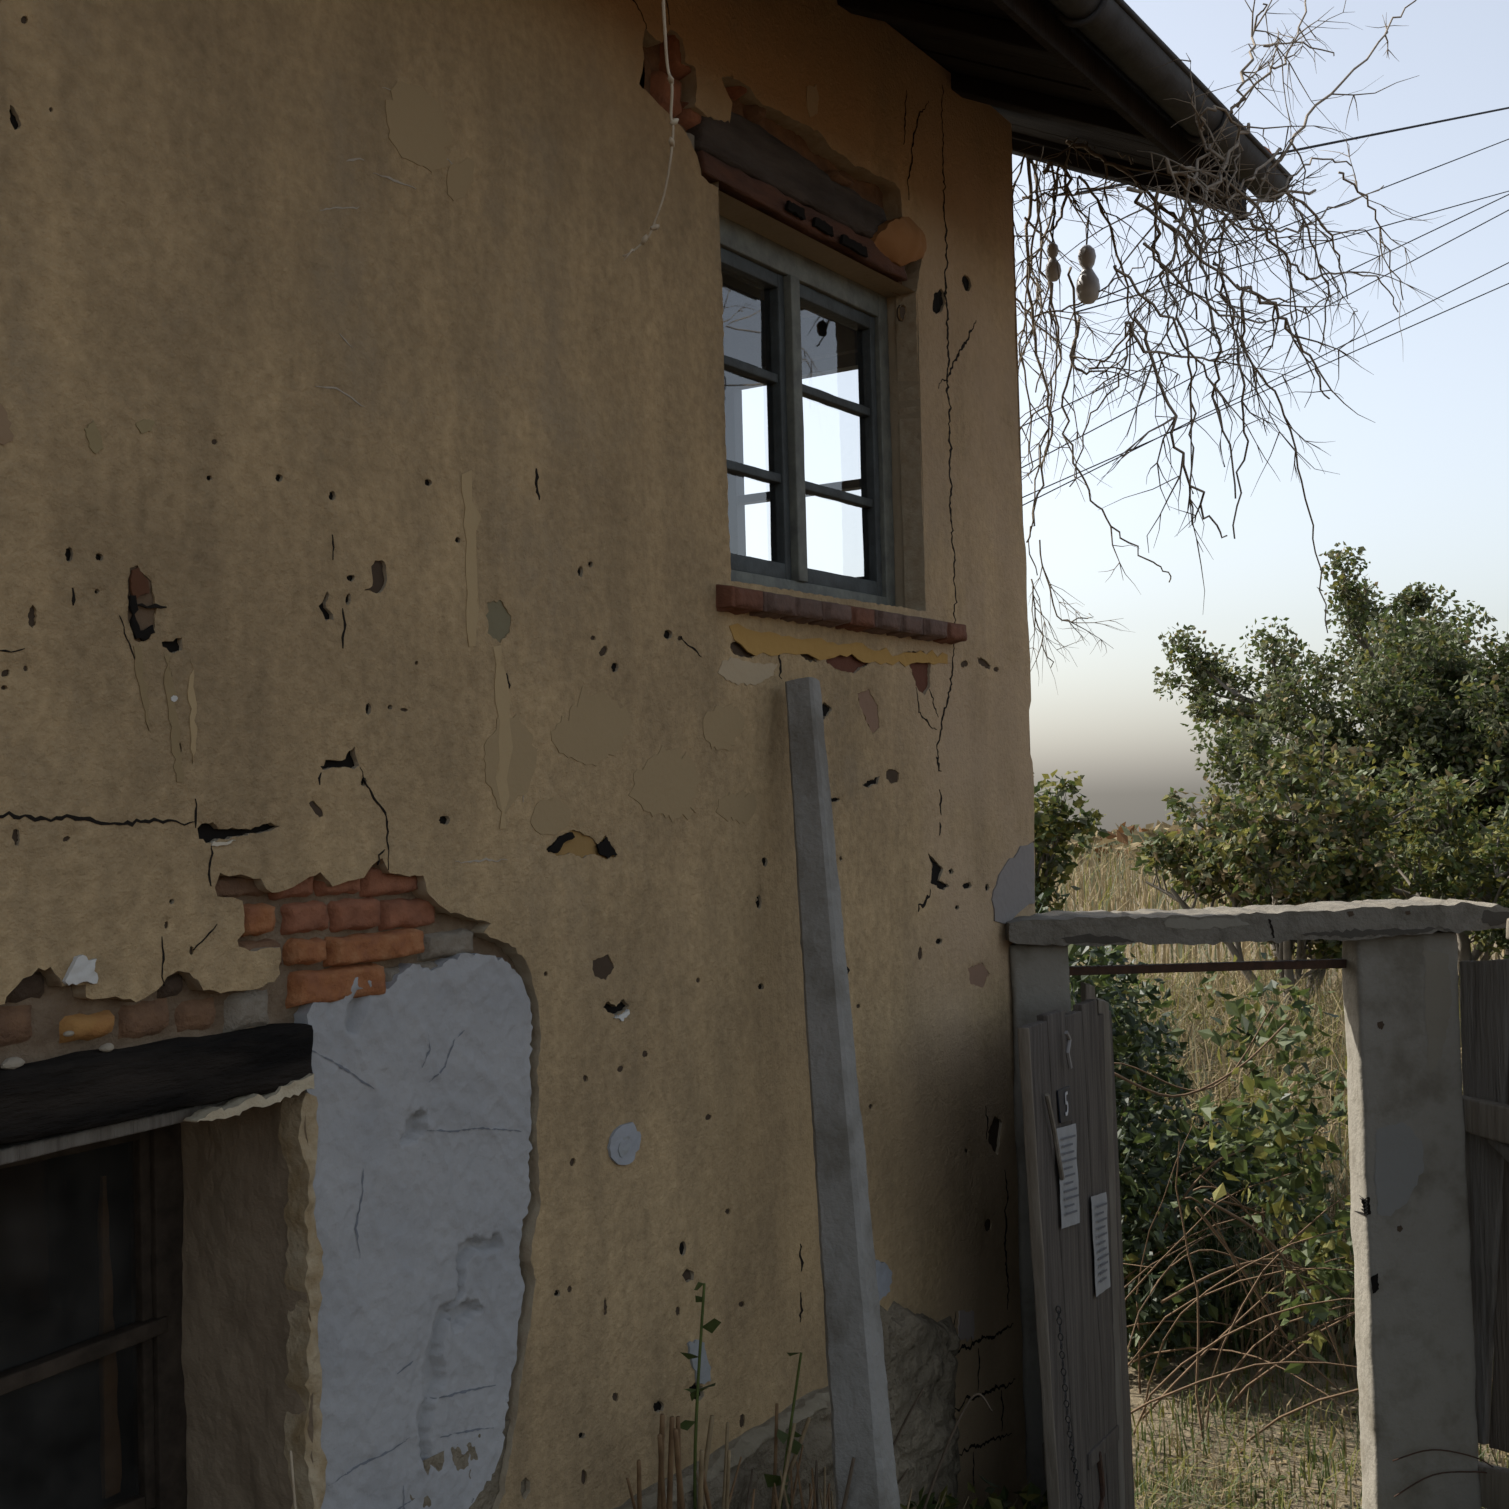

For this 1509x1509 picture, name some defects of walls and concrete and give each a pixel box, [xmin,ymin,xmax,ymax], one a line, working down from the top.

crack [632,0,670,30]
crack [903,85,976,835]
spalling [127,566,179,653]
spalling [730,642,752,658]
crack [0,799,214,886]
crack [360,767,389,870]
spalling [546,830,617,859]
flaking render [59,867,474,1043]
flaking render [0,972,44,1047]
crack [954,1106,1015,1486]